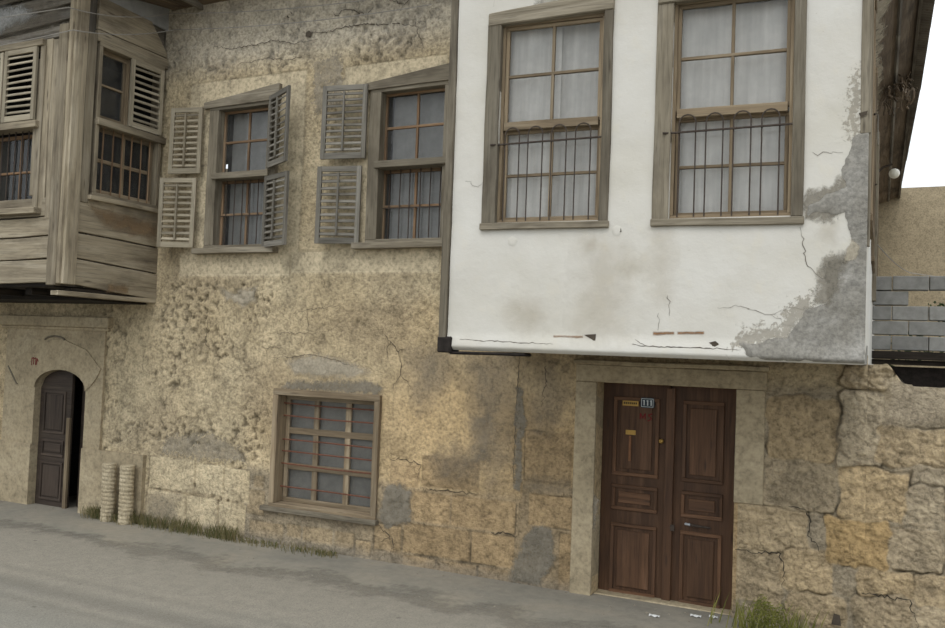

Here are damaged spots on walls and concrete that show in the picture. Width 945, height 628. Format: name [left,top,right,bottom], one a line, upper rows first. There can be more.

crack [214,0,425,63]
crack [384,334,411,392]
crack [390,458,479,495]